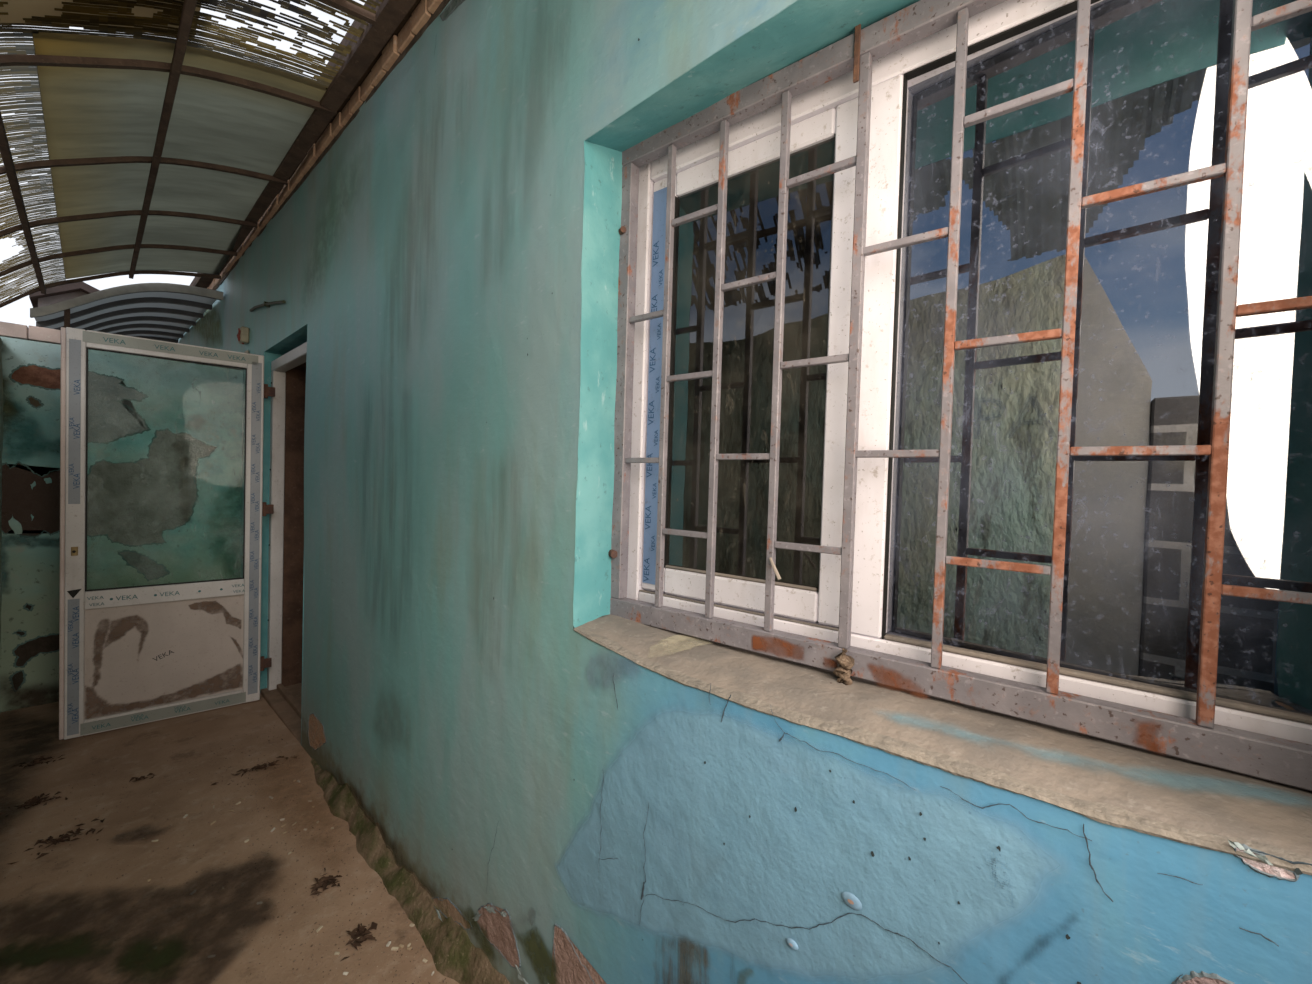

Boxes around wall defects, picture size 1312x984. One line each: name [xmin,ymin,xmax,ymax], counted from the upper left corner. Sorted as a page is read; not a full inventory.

spalling [1,461,60,538]
spalling [9,629,59,691]
corrosion [752,636,802,659]
crack [598,773,967,984]
spalling [432,897,528,984]
spalling [548,924,606,984]
spalling [1171,971,1235,984]